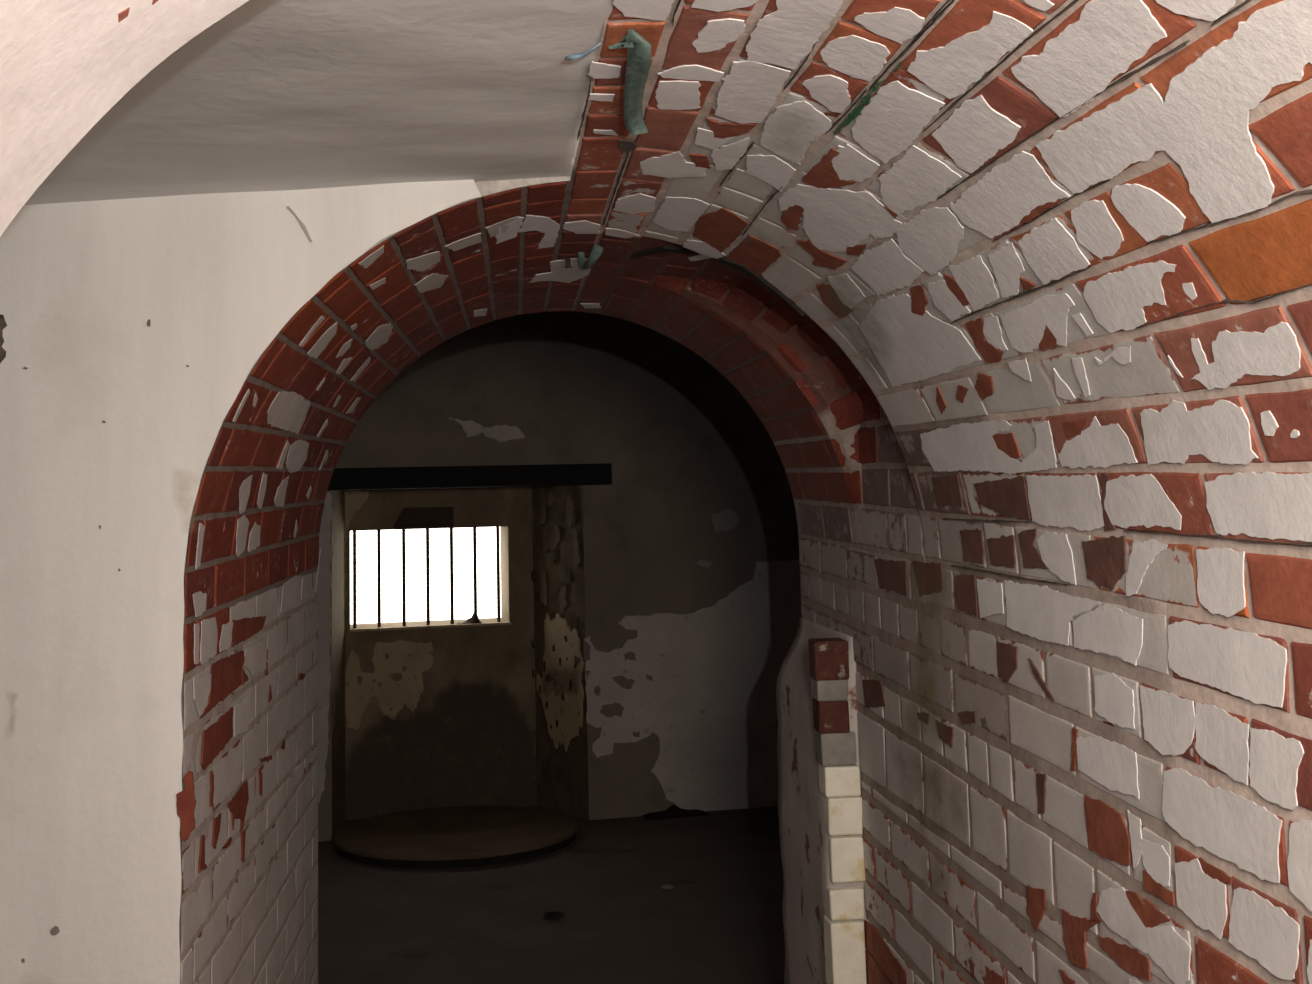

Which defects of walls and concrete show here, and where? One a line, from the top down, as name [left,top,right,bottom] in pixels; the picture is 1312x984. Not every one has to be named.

peeling [612,0,674,21]
peeling [588,61,621,102]
peeling [406,215,640,293]
peeling [613,193,782,276]
peeling [640,0,1312,707]
peeling [233,315,393,557]
peeling [176,486,434,873]
damp [345,685,538,821]
peeling [536,559,886,811]
peeling [917,711,976,748]
peeling [1026,673,1312,984]
peeling [864,920,908,984]